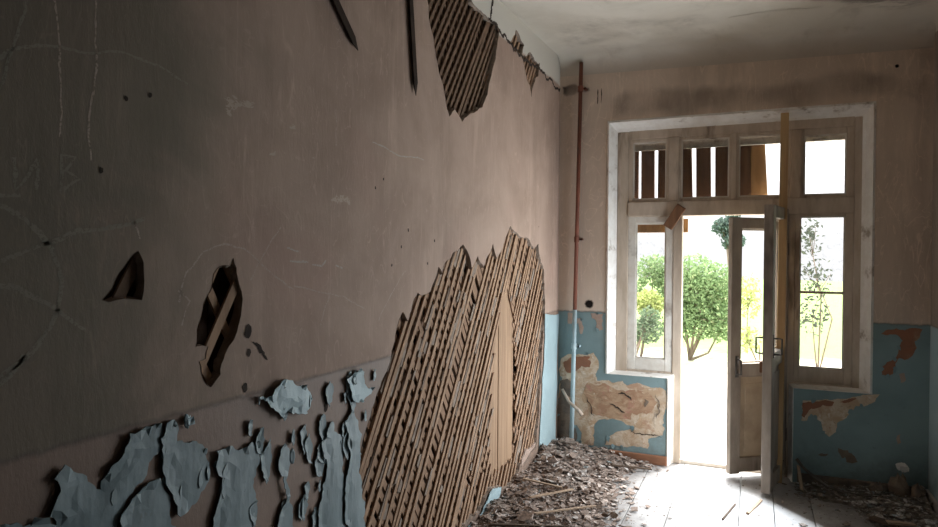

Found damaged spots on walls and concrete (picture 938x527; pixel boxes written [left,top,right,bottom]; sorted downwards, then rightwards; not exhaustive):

flaking render [428,0,499,122]
crack [488,0,560,92]
flaking render [511,30,540,97]
flaking render [0,226,667,527]
peeling [801,394,880,437]
peeling [880,328,923,383]